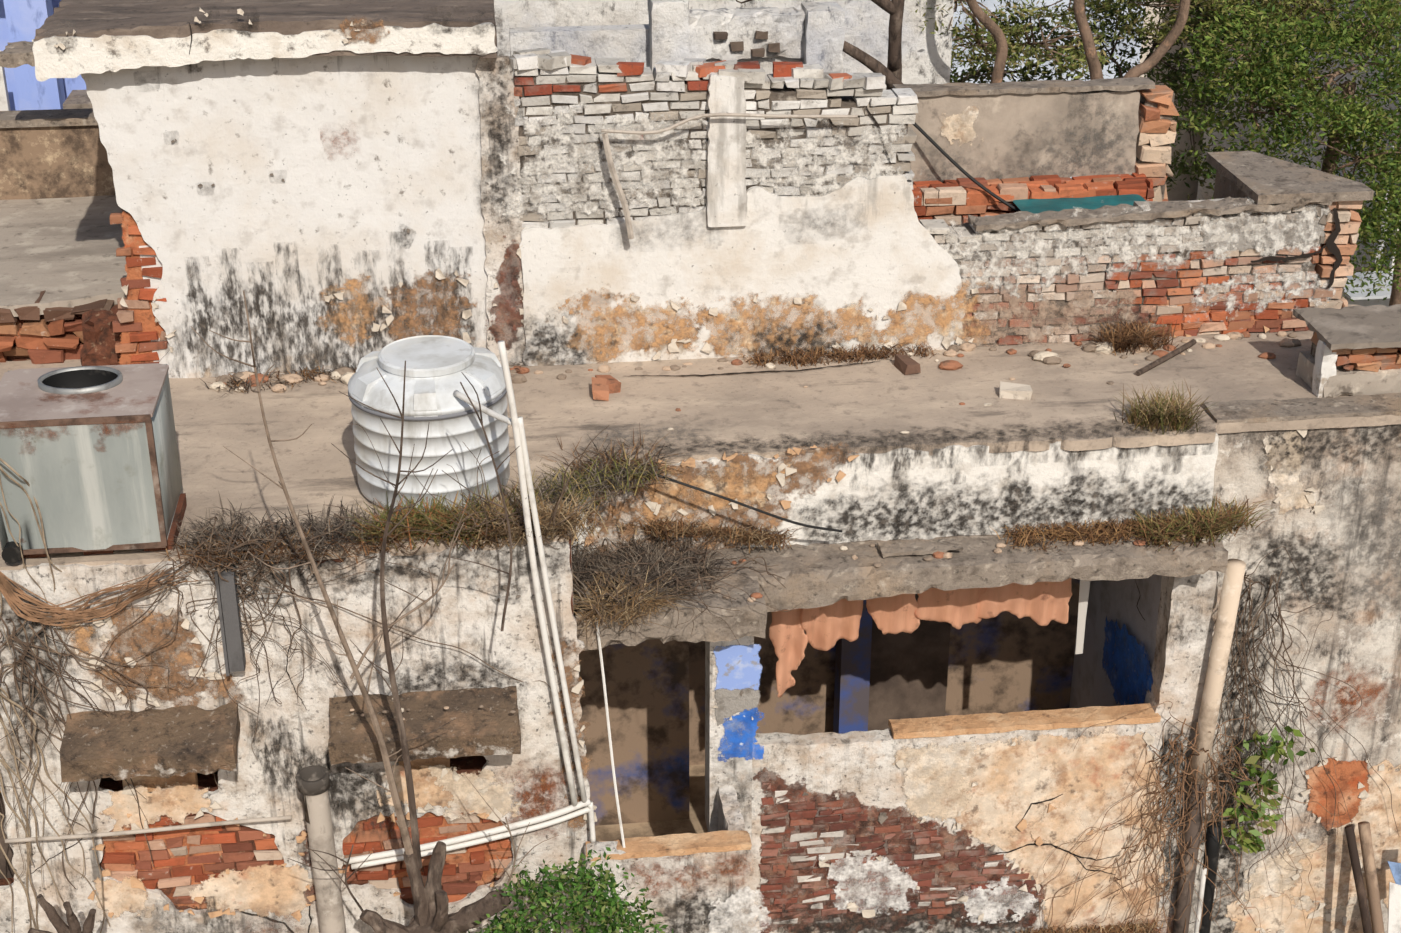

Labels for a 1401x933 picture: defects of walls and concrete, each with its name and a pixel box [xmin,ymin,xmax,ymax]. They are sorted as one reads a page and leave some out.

peeling [500,103,705,226]
peeling [746,117,914,197]
damp [177,245,474,375]
peeling [319,236,524,350]
peeling [559,204,1336,362]
damp [599,421,1214,544]
peeling [60,607,242,707]
spalling [87,782,316,922]
flaking render [338,764,522,903]
spalling [712,644,1168,933]
spalling [1225,757,1401,933]